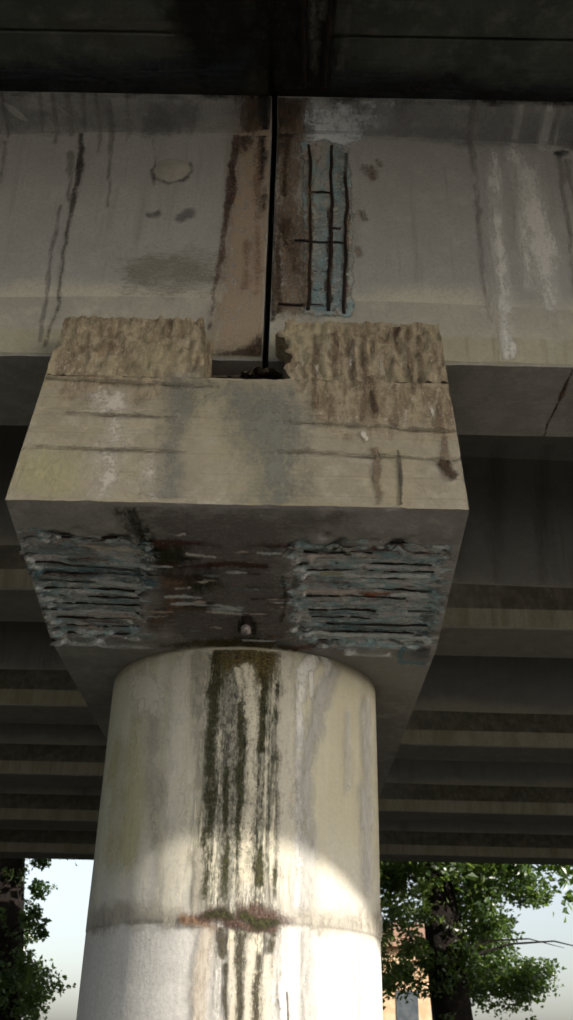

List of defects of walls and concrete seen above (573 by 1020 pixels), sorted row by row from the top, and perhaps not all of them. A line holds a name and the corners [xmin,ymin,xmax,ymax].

damp [304,0,573,157]
rust [217,96,307,350]
spalling [278,139,355,317]
damp [487,143,559,359]
rust [352,332,379,419]
rust [371,448,383,501]
rust [394,326,423,392]
rust [436,404,458,479]
crack [543,370,573,437]
spalling [16,528,271,649]
spalling [237,537,456,657]
damp [90,383,347,1020]